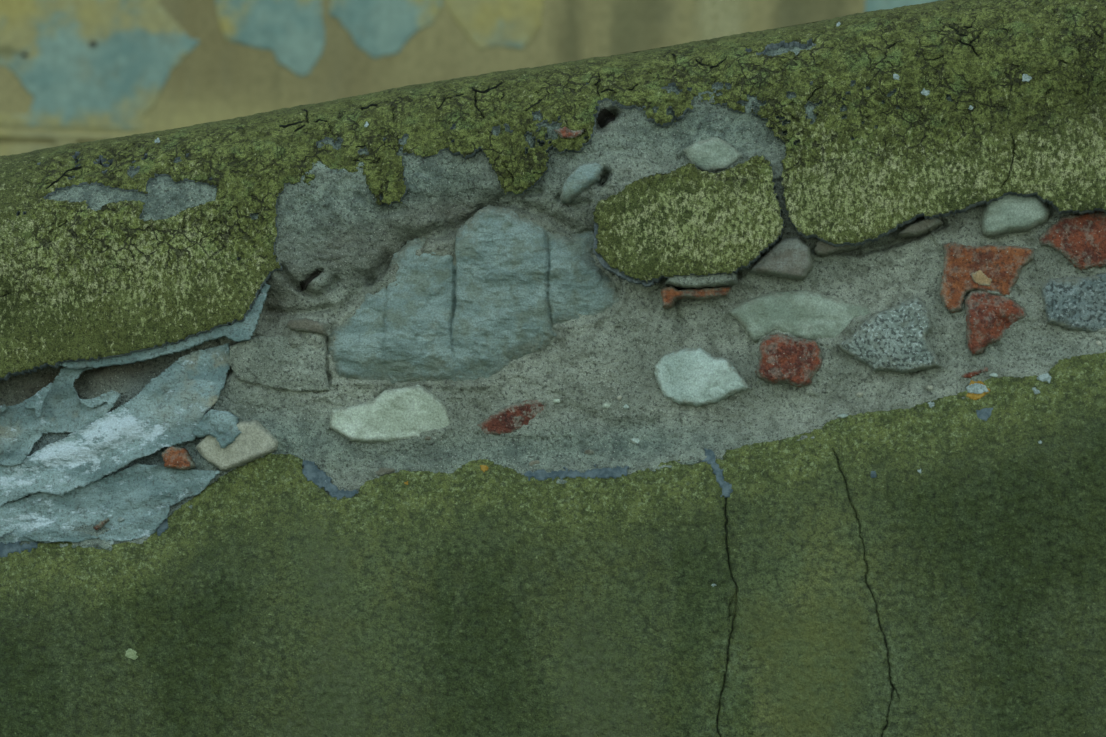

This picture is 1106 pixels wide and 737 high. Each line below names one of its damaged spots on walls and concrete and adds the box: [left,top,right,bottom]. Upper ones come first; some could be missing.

peeling [0,0,199,146]
peeling [215,0,543,77]
peeling [865,0,943,12]
spalling [0,94,1106,558]
crack [717,498,737,735]